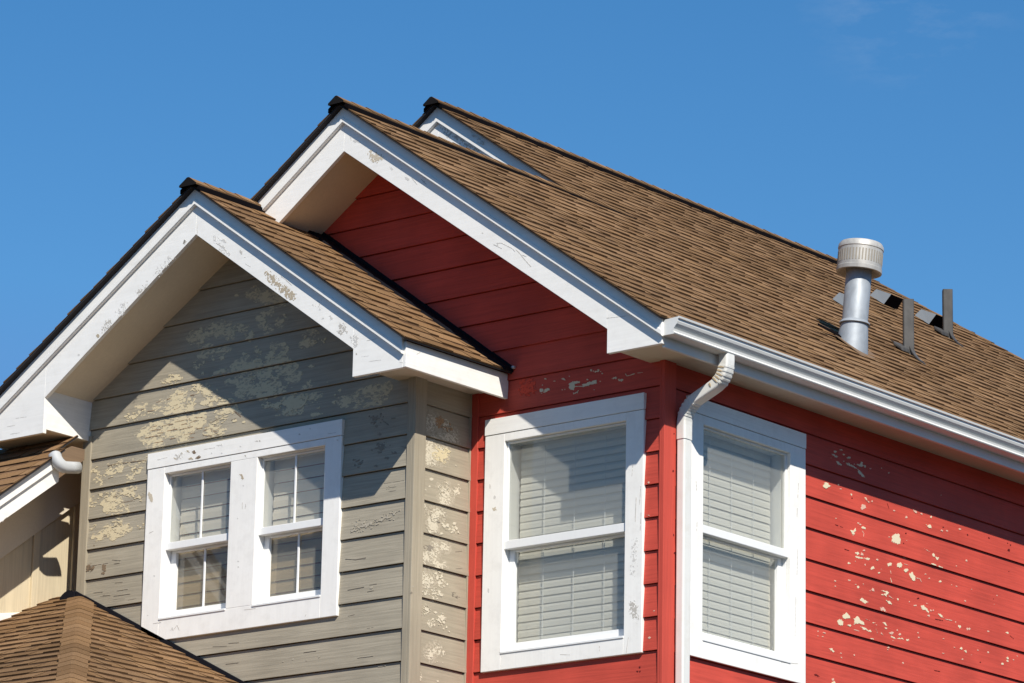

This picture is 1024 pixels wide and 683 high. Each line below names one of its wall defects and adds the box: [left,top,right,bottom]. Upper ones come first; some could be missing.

peeling [89,285,393,542]
peeling [540,369,643,394]
peeling [832,449,890,478]
peeling [420,414,461,681]
peeling [834,548,970,650]